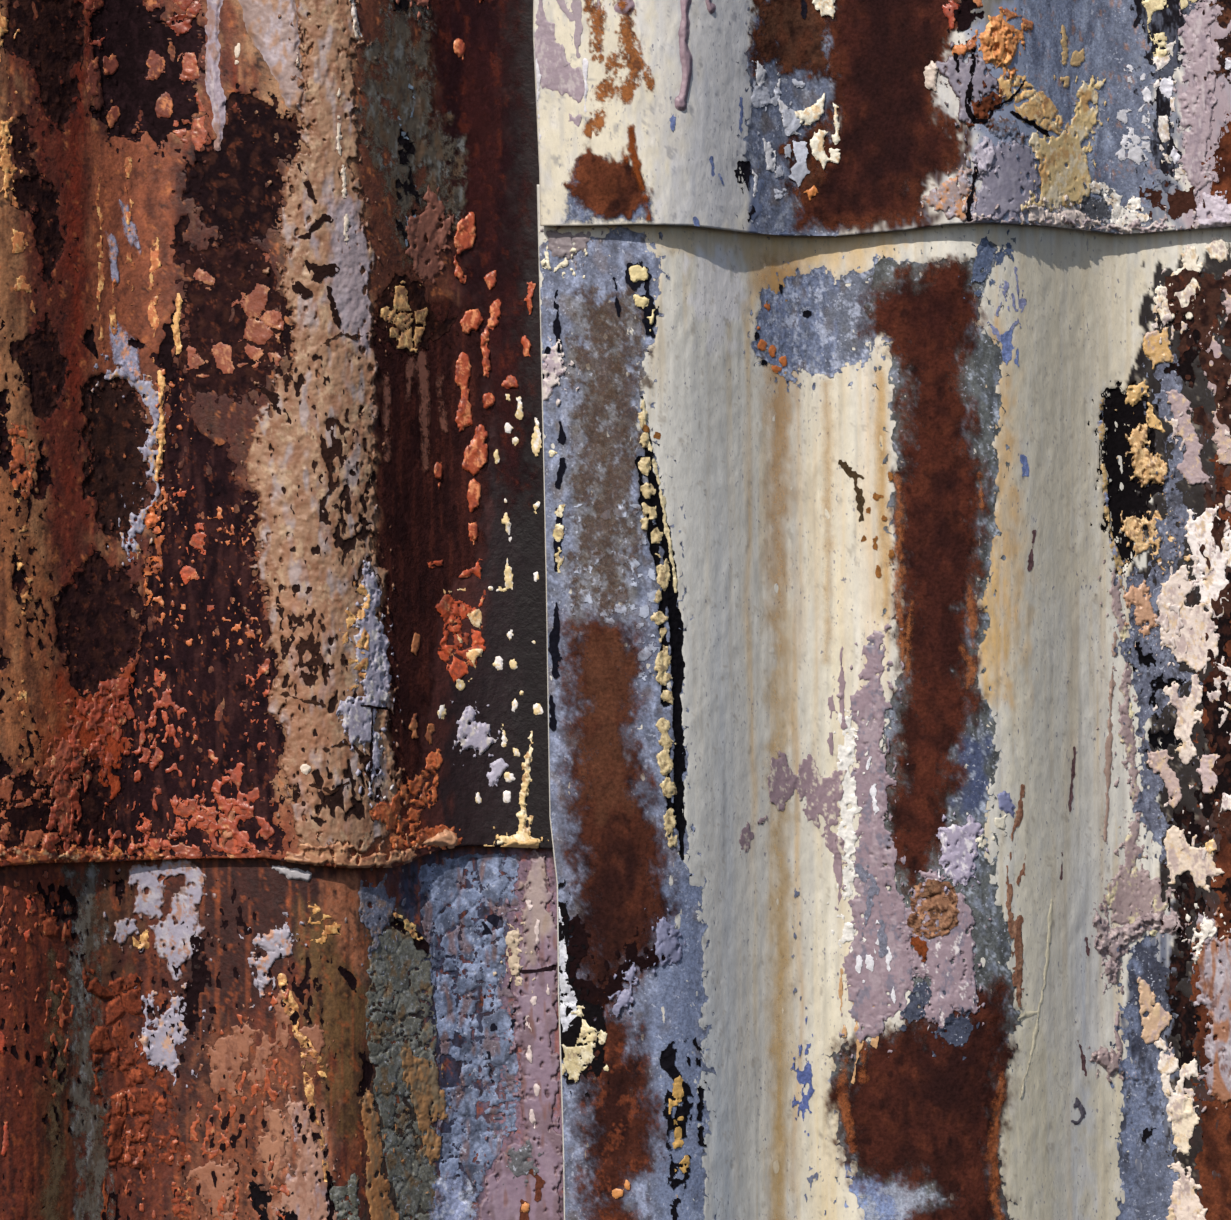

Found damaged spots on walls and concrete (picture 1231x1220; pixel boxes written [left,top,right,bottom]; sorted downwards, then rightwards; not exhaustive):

peeling [103,859,343,1220]
rust [0,0,536,1220]
peeling [437,679,520,804]
peeling [470,225,717,1220]
rust [563,0,654,224]
rust [558,285,678,1220]
rust [794,0,984,231]
rust [826,968,1018,1220]
rust [858,255,990,890]
peeling [734,0,1231,1220]
rust [1155,268,1231,439]
rust [1158,572,1231,1220]